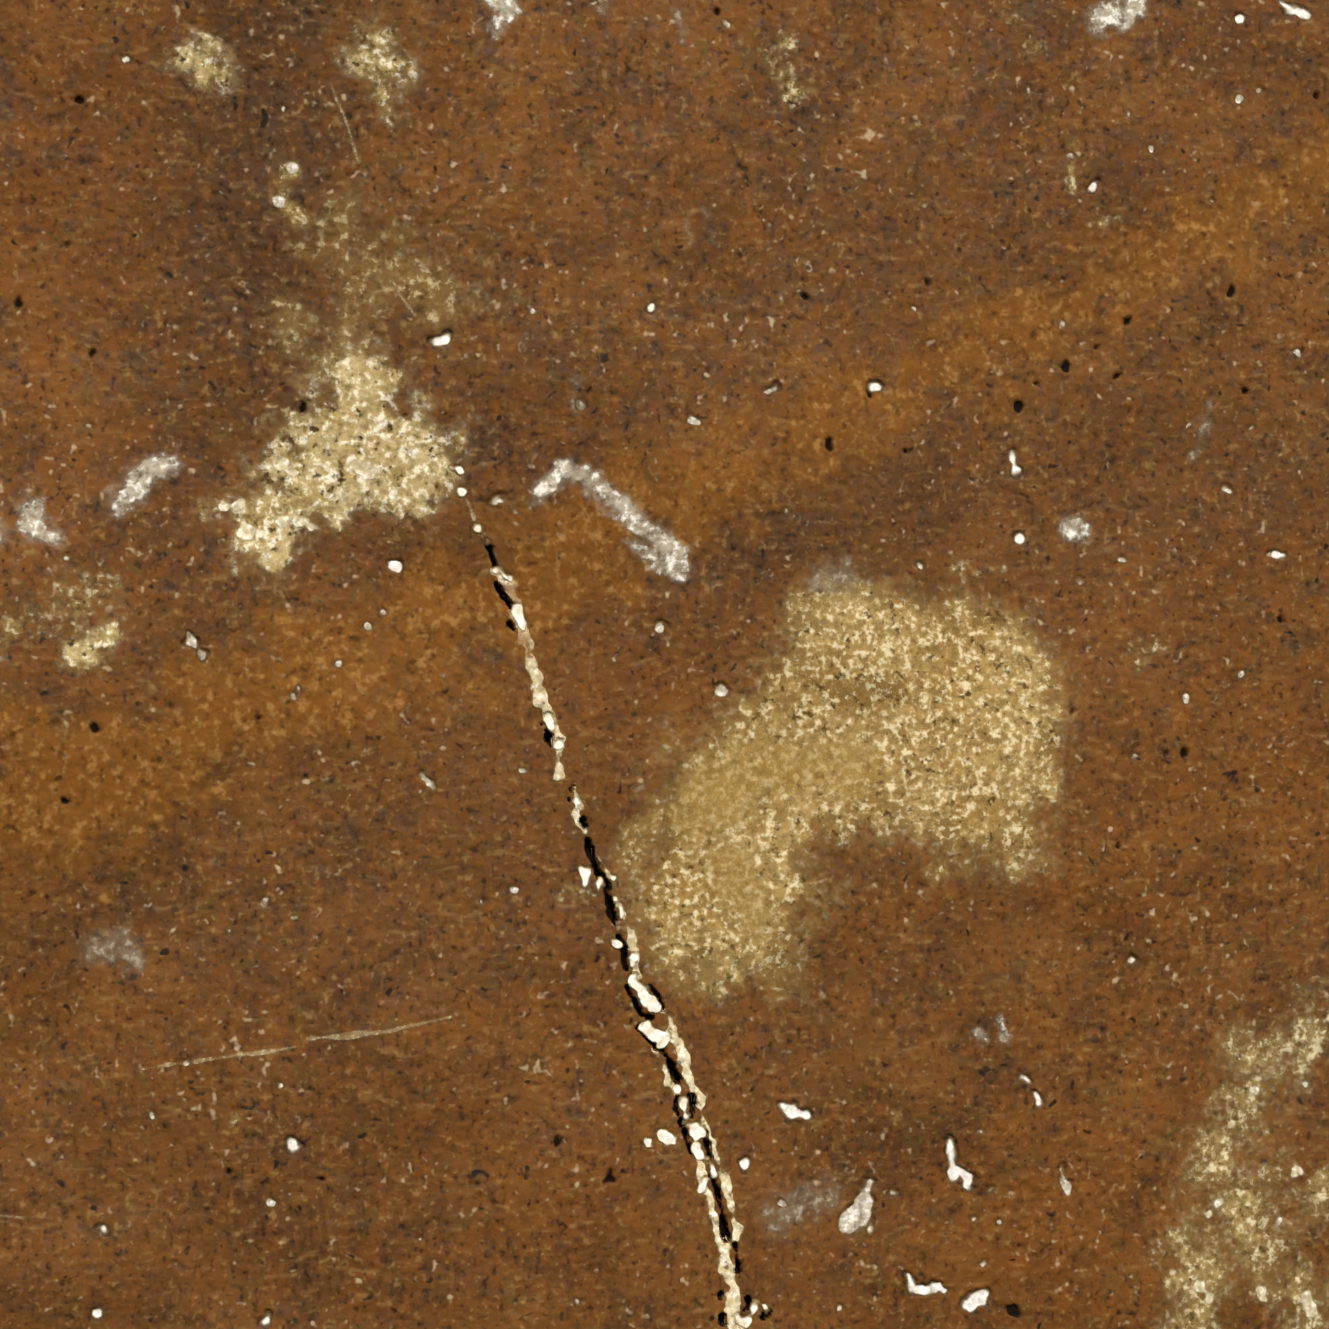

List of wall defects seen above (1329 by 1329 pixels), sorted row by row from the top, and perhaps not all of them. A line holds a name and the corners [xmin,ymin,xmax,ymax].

crack [335,97,358,161]
leakage [396,571,499,630]
leakage [0,755,161,845]
crack [449,466,772,1329]